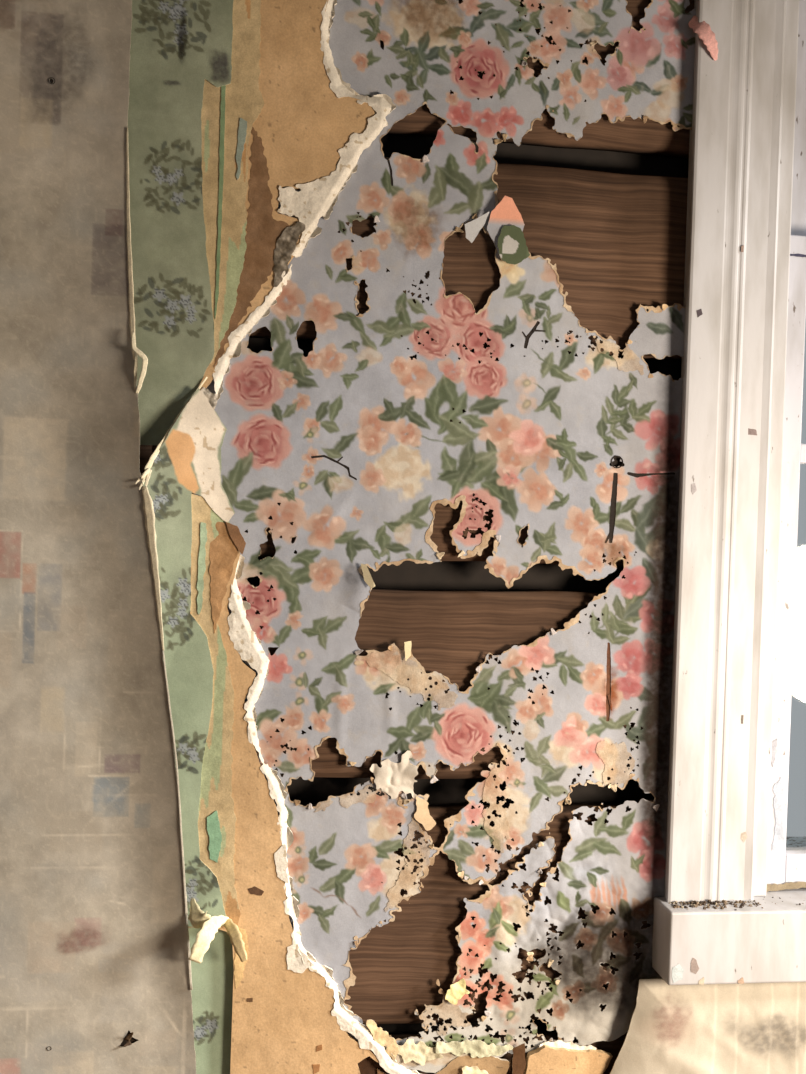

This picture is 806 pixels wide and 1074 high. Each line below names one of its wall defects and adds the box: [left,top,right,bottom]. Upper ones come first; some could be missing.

peeling [212,127,290,372]
peeling [587,334,644,375]
peeling [354,643,458,711]
peeling [596,740,635,792]
peeling [294,777,382,813]
peeling [482,761,511,853]
peeling [274,844,289,883]
peeling [384,819,434,912]
peeling [188,898,248,988]
peeling [287,944,314,973]
peeling [421,995,491,1036]